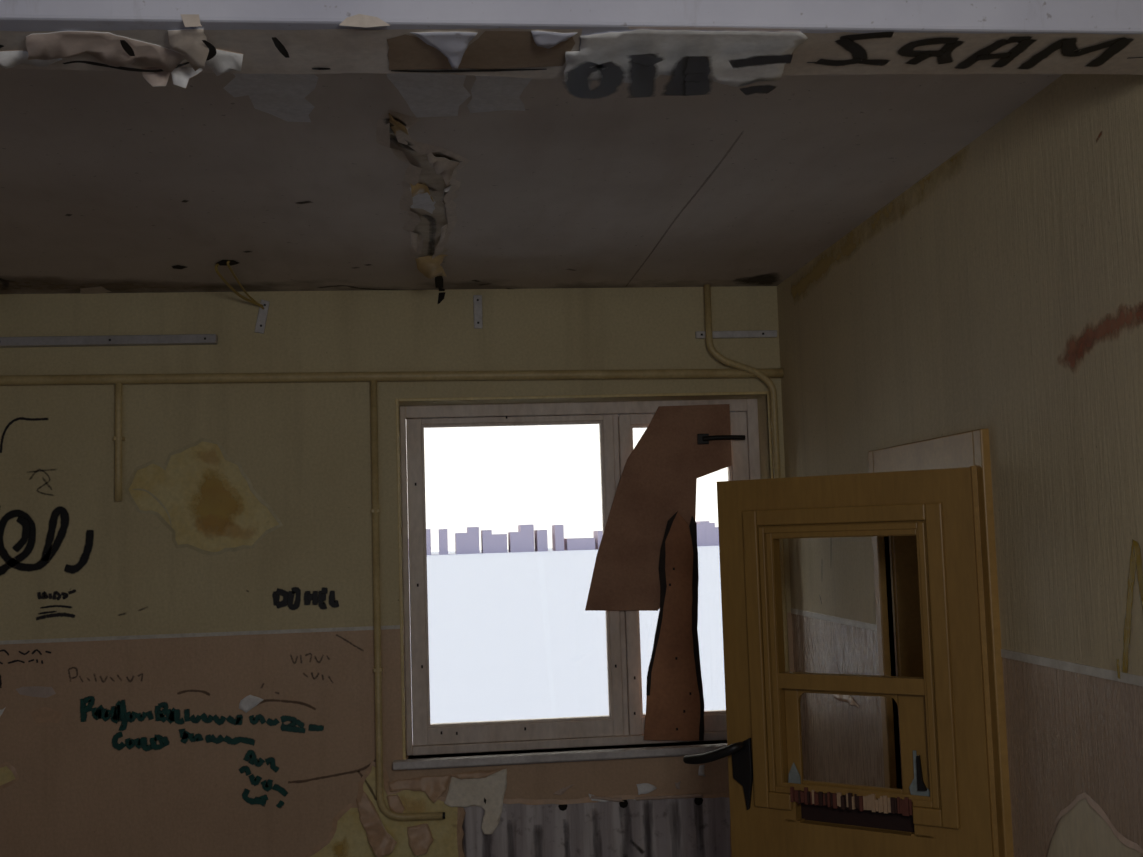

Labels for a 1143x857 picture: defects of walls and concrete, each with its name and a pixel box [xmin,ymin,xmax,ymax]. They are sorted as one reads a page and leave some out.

peeling [0,14,1143,99]
peeling [376,109,470,279]
crack [435,276,443,288]
peeling [444,768,507,834]
peeling [1044,793,1143,857]